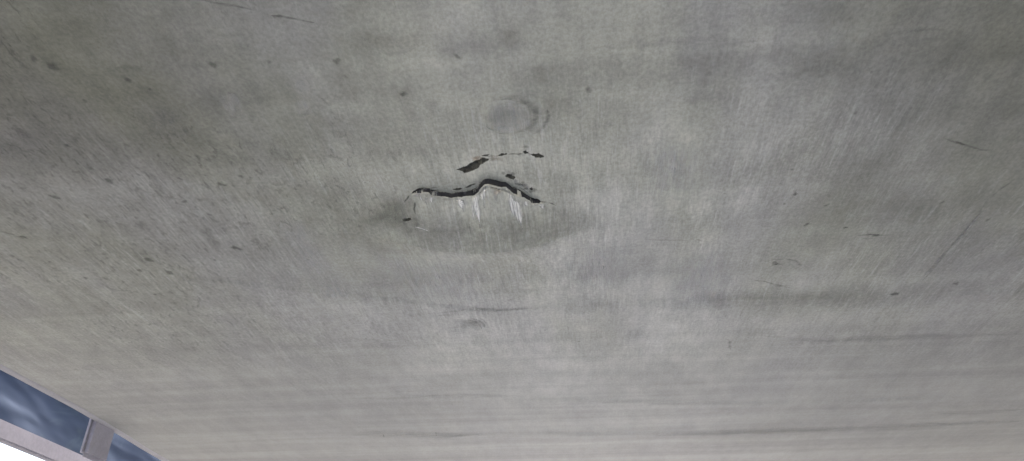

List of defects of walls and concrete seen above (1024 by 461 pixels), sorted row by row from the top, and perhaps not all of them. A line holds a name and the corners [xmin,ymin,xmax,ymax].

water stain [448,187,485,222]
crack [407,179,552,208]
water stain [510,195,544,222]